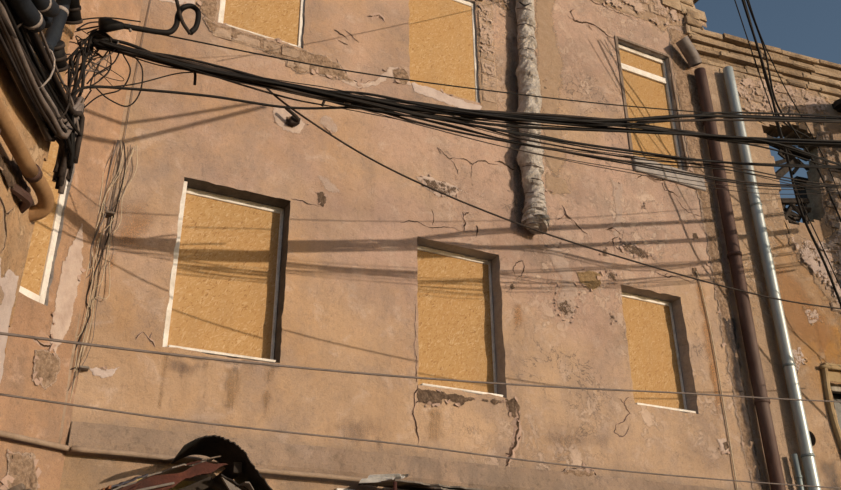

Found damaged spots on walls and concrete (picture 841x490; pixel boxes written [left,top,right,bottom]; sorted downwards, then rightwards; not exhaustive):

spalling [160,0,511,111]
peeling [535,0,571,194]
peeling [0,257,19,382]
spalling [0,154,31,192]
peeling [32,223,86,389]
crack [400,209,479,237]
crack [437,147,515,177]
peeling [546,242,619,323]
spalling [595,0,769,490]
spalling [735,78,841,314]
spalling [0,449,42,490]
crack [505,404,522,467]